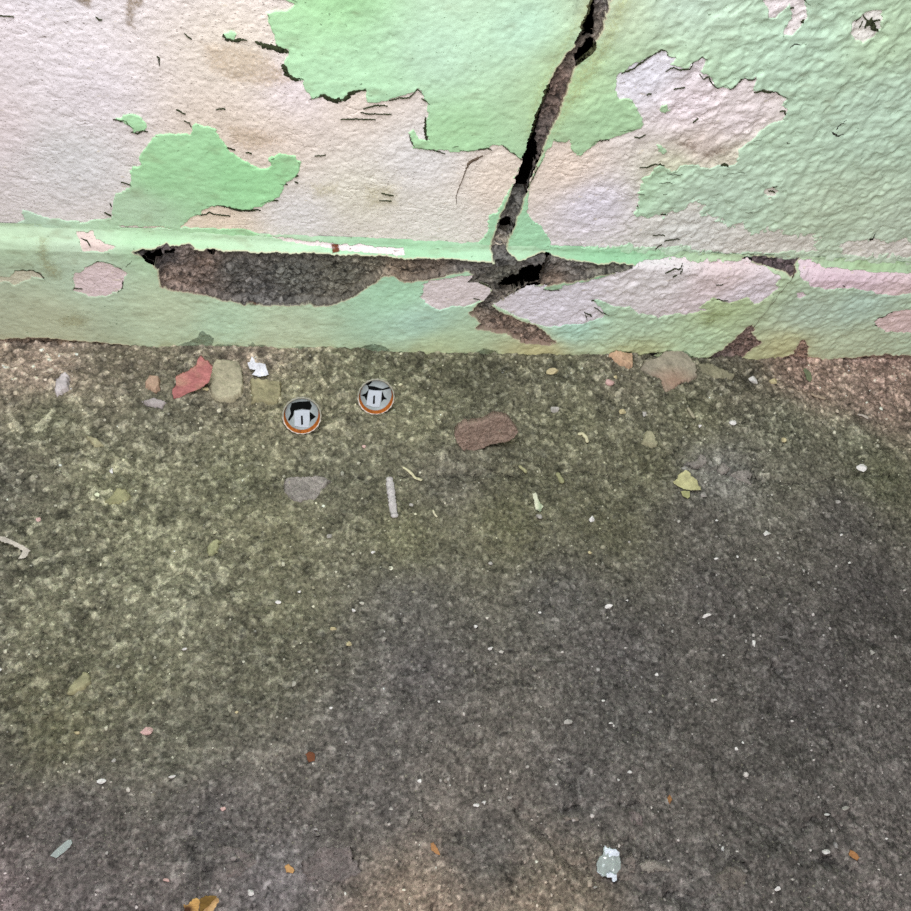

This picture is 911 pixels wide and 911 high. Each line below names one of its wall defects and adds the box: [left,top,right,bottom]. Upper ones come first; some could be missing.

peeling [0,0,911,327]
crack [469,0,607,342]
peeling [874,309,911,333]